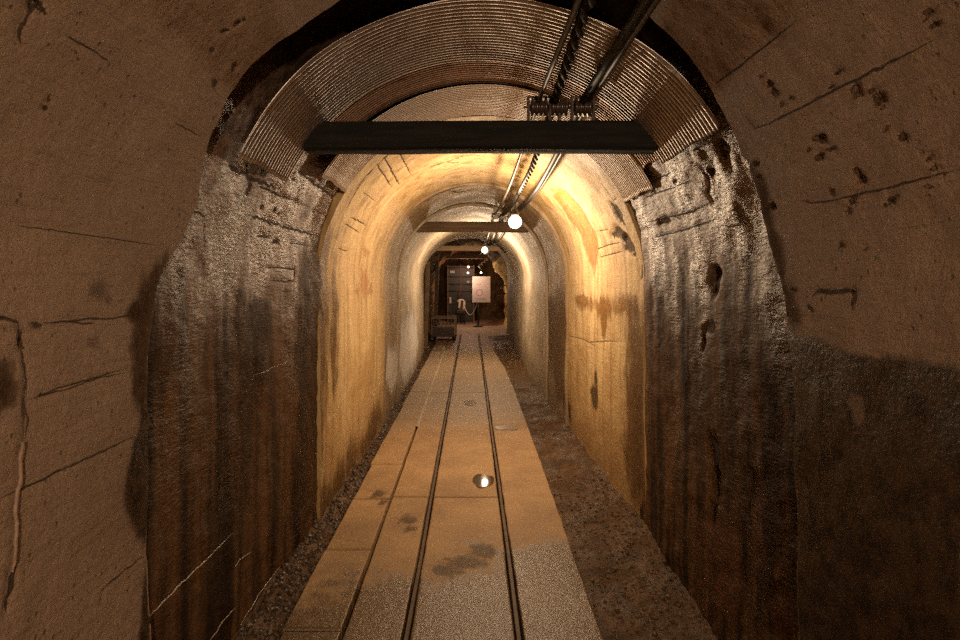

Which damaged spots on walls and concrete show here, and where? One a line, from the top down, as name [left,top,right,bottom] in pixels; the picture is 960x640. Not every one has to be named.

crack [716,22,794,83]
crack [745,39,934,129]
crack [802,169,960,203]
crack [23,226,158,246]
crack [814,288,856,304]
water stain [126,254,168,542]
water stain [548,287,645,509]
water stain [750,169,960,640]
crack [0,315,136,612]
crack [98,555,146,607]
water stain [140,576,151,640]
water stain [434,543,495,574]